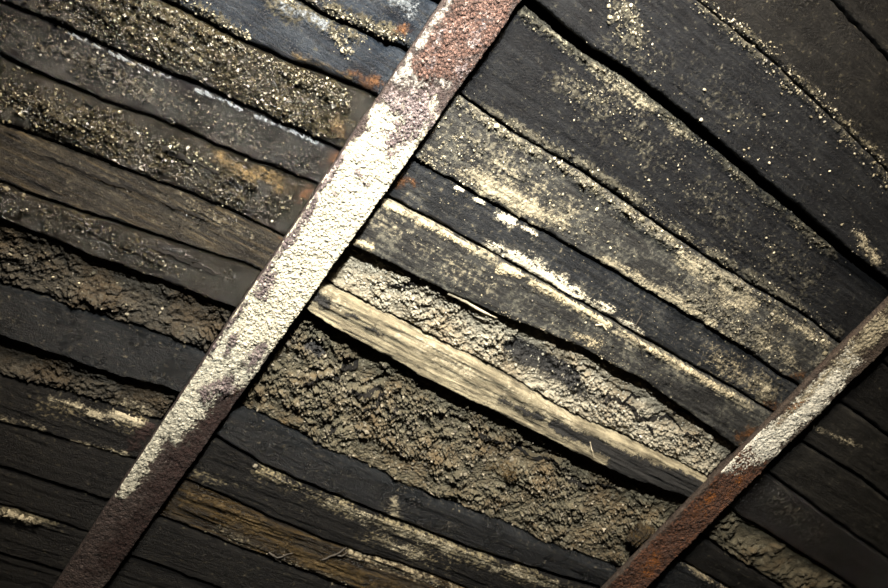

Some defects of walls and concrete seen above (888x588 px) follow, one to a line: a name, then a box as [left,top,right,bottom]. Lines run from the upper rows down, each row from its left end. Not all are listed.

water stain [280,1,330,31]
water stain [68,32,171,79]
water stain [195,87,243,112]
rust [380,0,520,160]
water stain [254,114,324,147]
water stain [213,151,296,194]
water stain [383,204,406,215]
water stain [453,169,571,236]
rust [209,152,345,359]
water stain [349,238,375,251]
water stain [414,218,771,401]
rust [607,425,768,588]